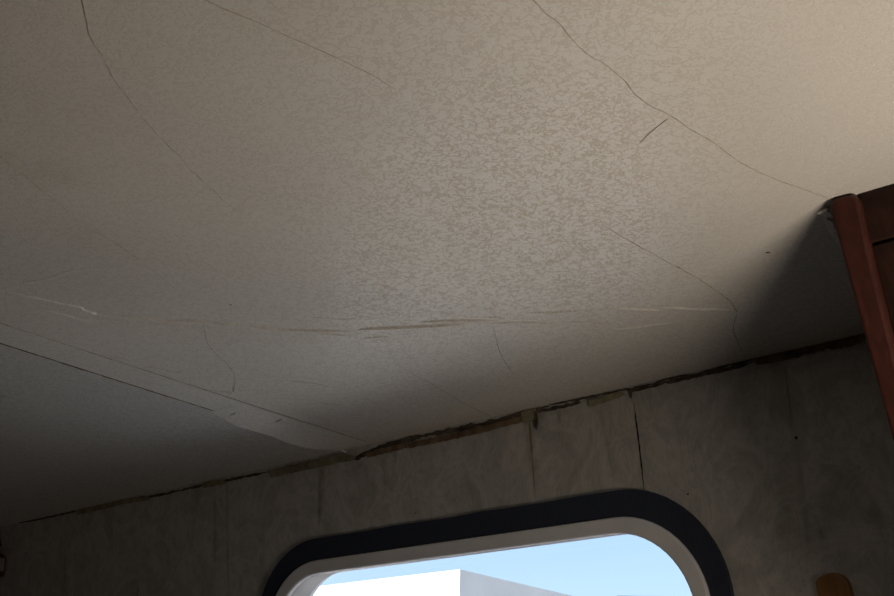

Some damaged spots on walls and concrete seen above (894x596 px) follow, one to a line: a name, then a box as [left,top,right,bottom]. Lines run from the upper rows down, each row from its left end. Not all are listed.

crack [205,0,394,89]
crack [81,0,258,225]
crack [533,0,828,199]
crack [348,229,822,485]
peeling [210,402,365,453]
crack [133,484,203,498]
crack [224,471,268,482]